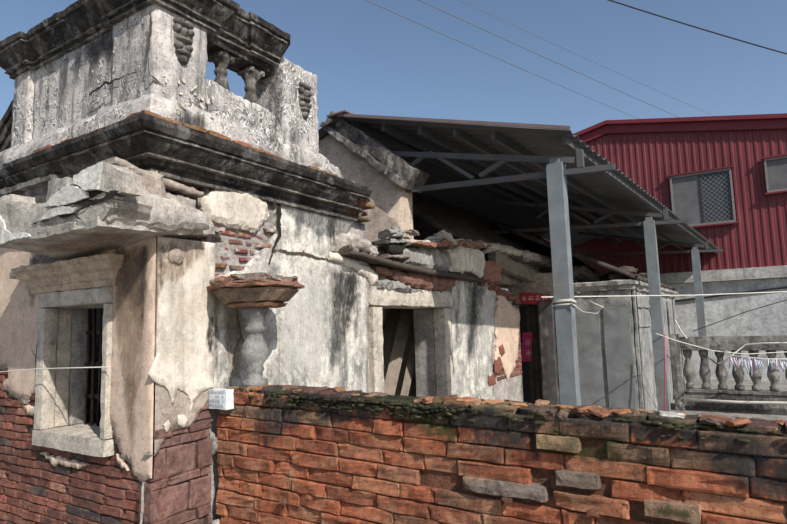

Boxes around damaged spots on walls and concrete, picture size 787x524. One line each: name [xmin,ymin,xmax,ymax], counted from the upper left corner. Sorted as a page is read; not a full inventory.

water stain [60,29,113,90]
crack [89,11,166,95]
spalling [0,162,142,244]
crack [268,203,334,265]
water stain [29,235,147,438]
flaking render [148,221,277,432]
water stain [283,271,361,373]
water stain [457,282,493,357]
flaking render [477,282,523,386]
flaking render [0,368,169,524]